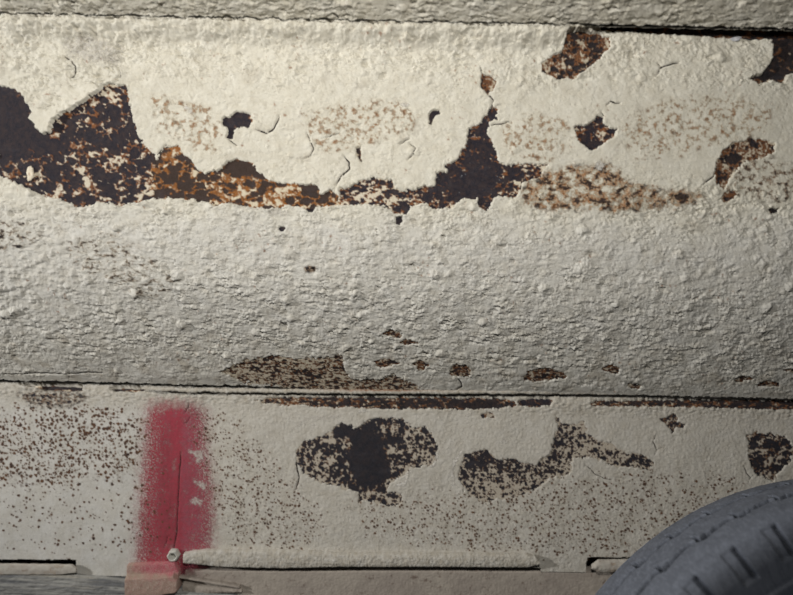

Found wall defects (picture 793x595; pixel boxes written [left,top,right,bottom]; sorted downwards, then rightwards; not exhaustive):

peeling [751,31,793,84]
peeling [0,83,156,208]
corrosion [152,97,222,150]
corrosion [148,145,341,210]
corrosion [306,101,415,152]
peeling [337,105,548,215]
corrosion [503,116,569,161]
corrosion [522,163,701,214]
corrosion [221,354,516,419]
peeling [296,417,438,507]
peeling [457,417,654,503]
peeling [746,430,793,482]